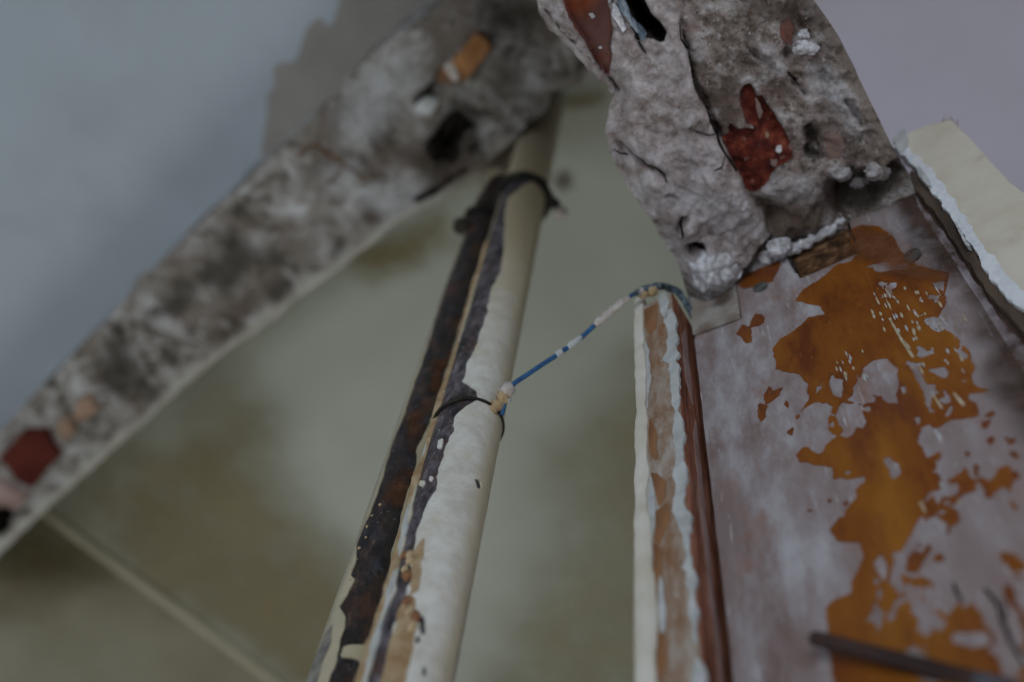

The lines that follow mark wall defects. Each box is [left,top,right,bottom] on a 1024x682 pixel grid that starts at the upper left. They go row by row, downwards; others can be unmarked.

spalling [563,0,613,74]
crack [679,22,737,172]
spalling [722,83,820,191]
peeling [738,260,781,289]
peeling [736,313,765,343]
peeling [757,225,1024,682]
rust [385,471,413,505]
rust [400,550,414,582]
rust [402,596,421,632]